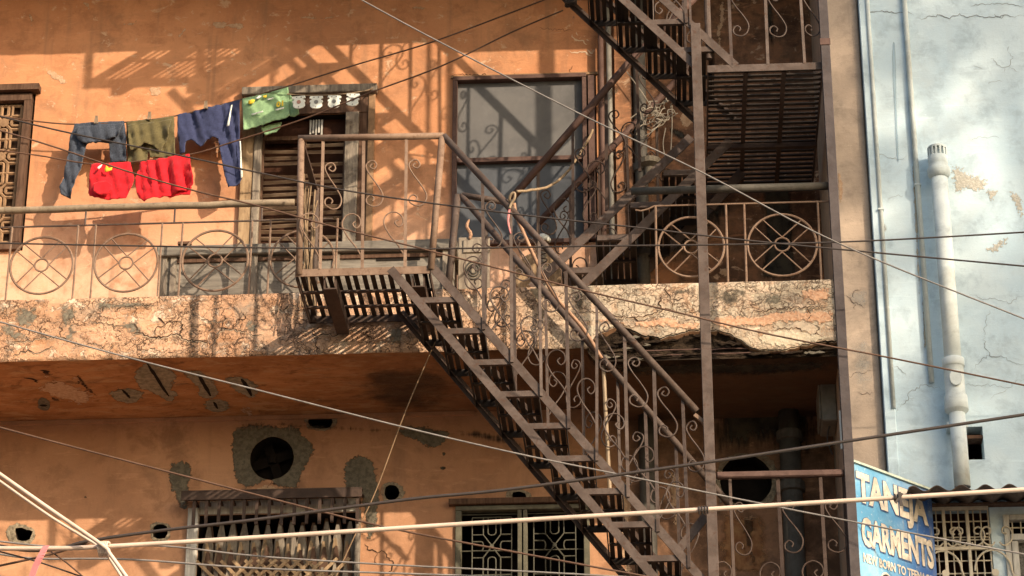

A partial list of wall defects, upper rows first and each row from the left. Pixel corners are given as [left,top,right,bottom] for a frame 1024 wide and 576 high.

crack [870,3,1022,20]
peeling [951,166,1024,217]
crack [576,286,686,328]
crack [749,291,862,337]
crack [5,303,372,401]
crack [969,294,1023,395]
peeling [37,376,93,411]
water stain [373,372,438,406]